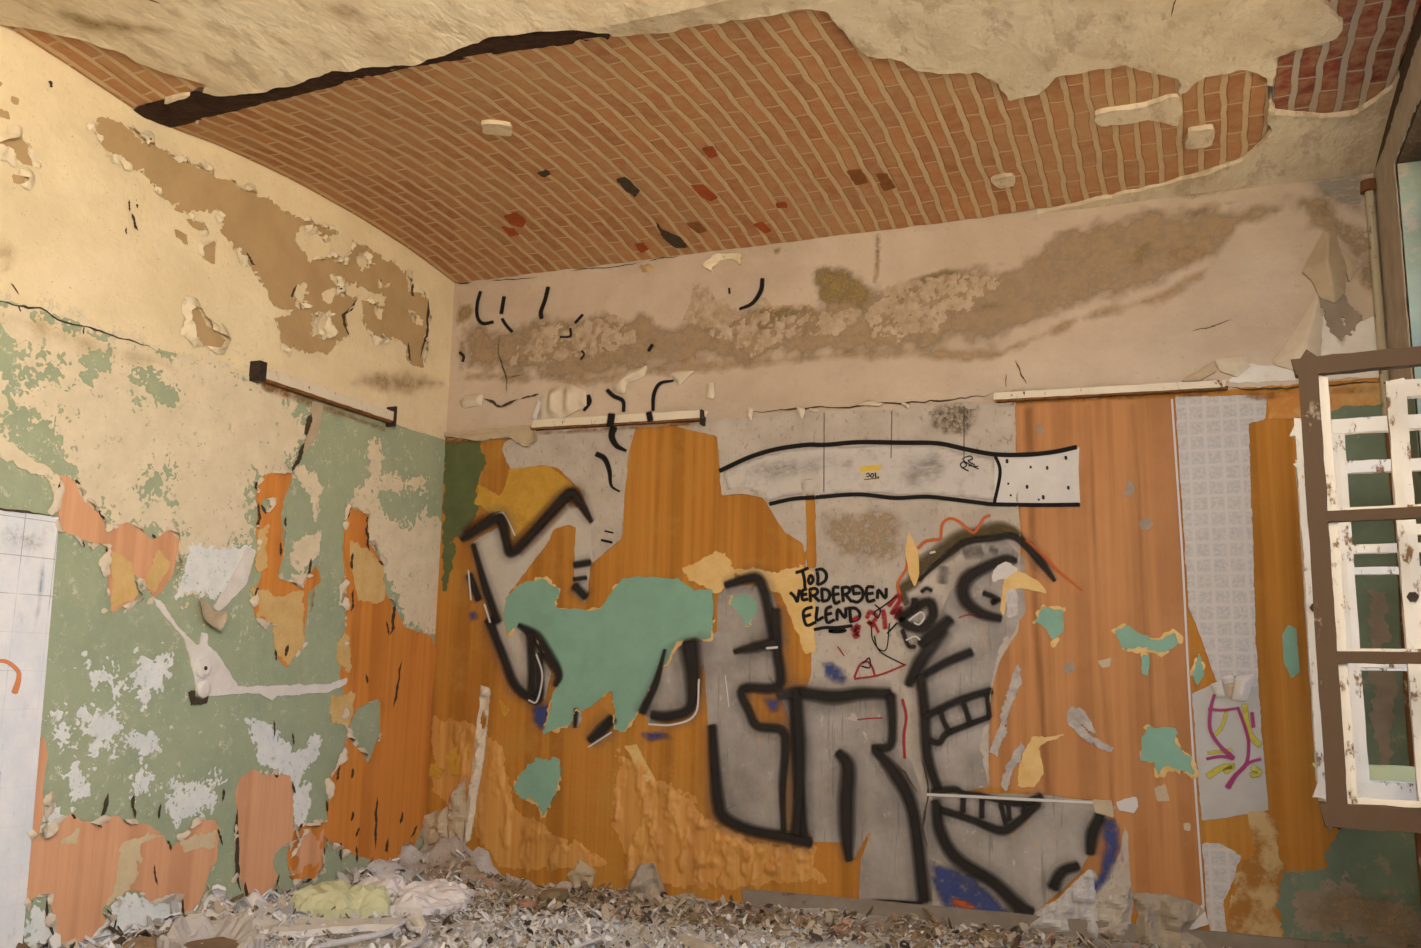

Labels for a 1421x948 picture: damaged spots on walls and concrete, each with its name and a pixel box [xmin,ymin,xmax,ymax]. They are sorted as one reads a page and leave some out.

peeling [0,81,42,190]
flaking render [8,0,1421,368]
water stain [458,208,1276,383]
water stain [1301,199,1372,287]
peeling [0,279,324,630]
peeling [347,436,441,635]
peeling [39,642,228,853]
peeling [244,717,329,832]
peeling [464,685,491,844]
flaking render [1367,671,1401,765]
peeling [23,900,56,948]
peeling [91,892,182,939]